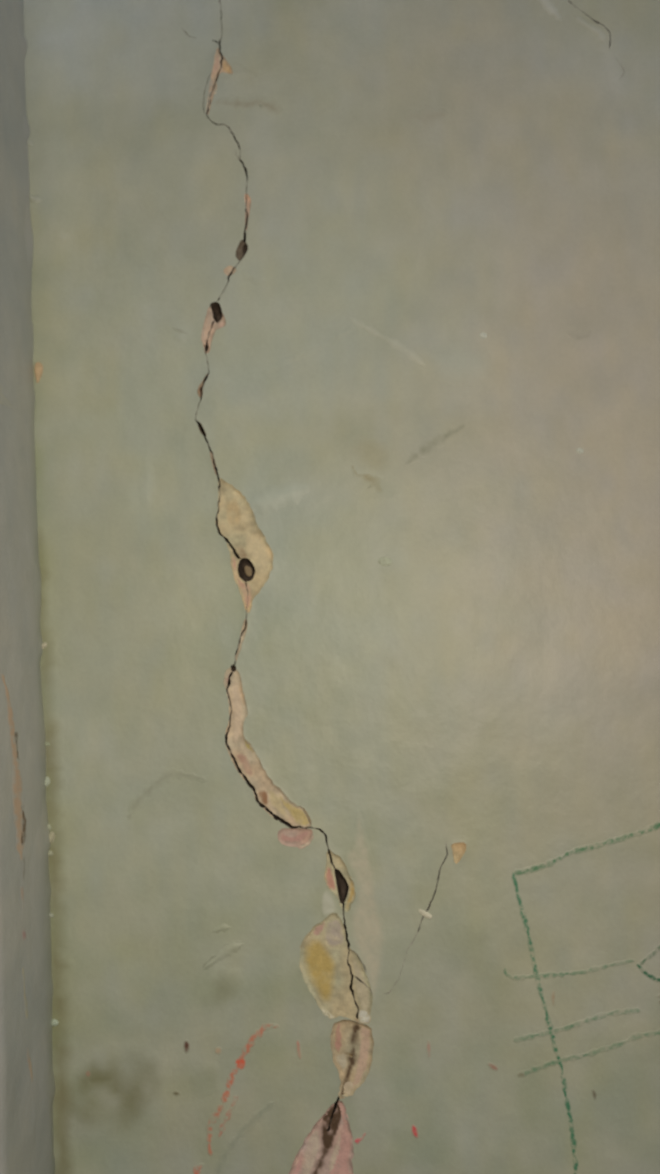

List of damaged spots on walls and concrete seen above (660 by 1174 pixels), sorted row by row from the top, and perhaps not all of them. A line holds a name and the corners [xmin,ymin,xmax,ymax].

crack [568,0,624,79]
crack [185,0,335,869]
spalling [210,452,314,849]
crack [326,1096,340,1131]
peeling [289,808,387,1174]
crack [342,845,448,1018]